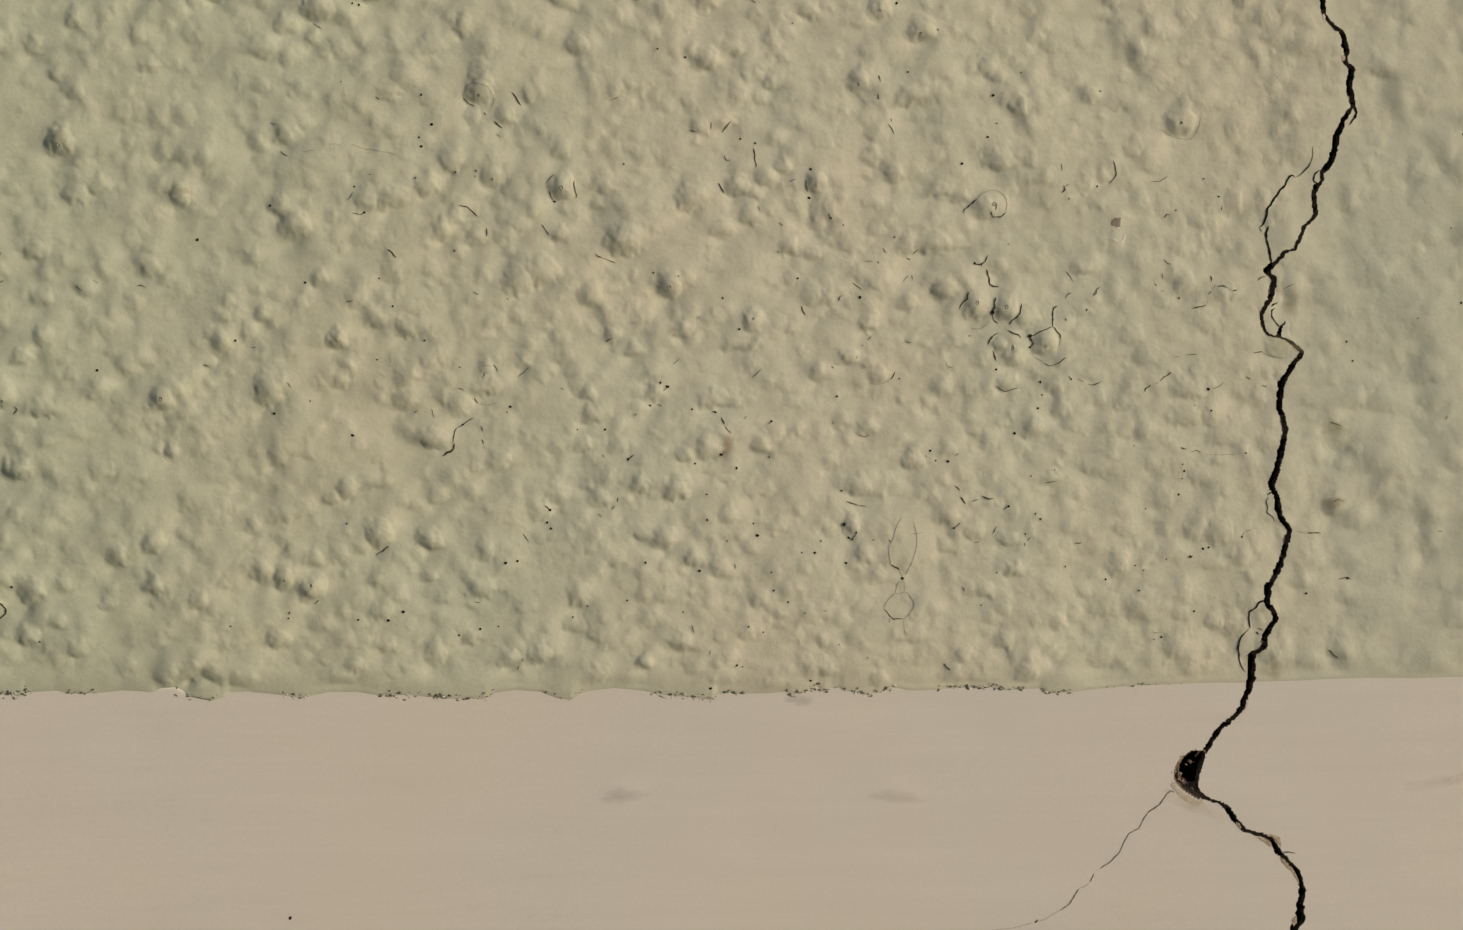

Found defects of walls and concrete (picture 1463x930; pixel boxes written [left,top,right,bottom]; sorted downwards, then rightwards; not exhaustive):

crack [963,190,1007,218]
crack [959,256,1066,392]
crack [996,0,1358,930]
crack [884,517,922,635]